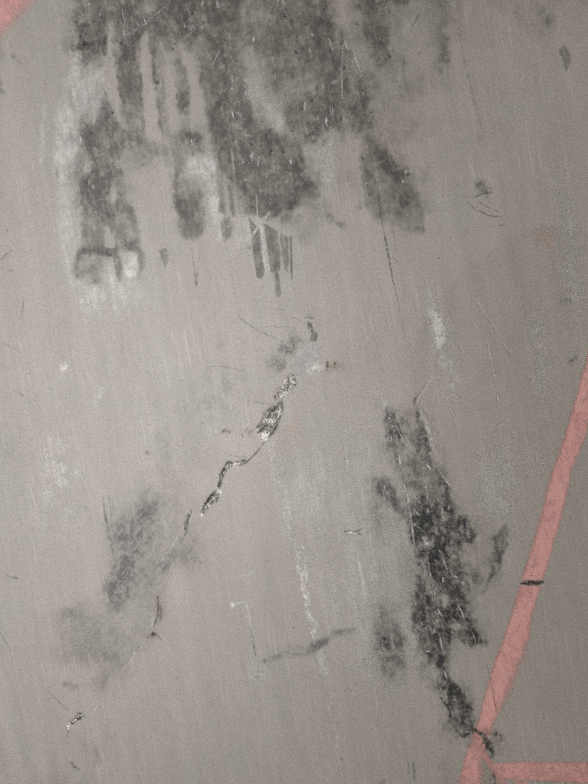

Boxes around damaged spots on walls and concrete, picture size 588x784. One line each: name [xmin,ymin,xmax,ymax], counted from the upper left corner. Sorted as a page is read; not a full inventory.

leakage [37,8,164,330]
leakage [118,0,361,339]
leakage [375,149,405,182]
leakage [260,359,553,737]